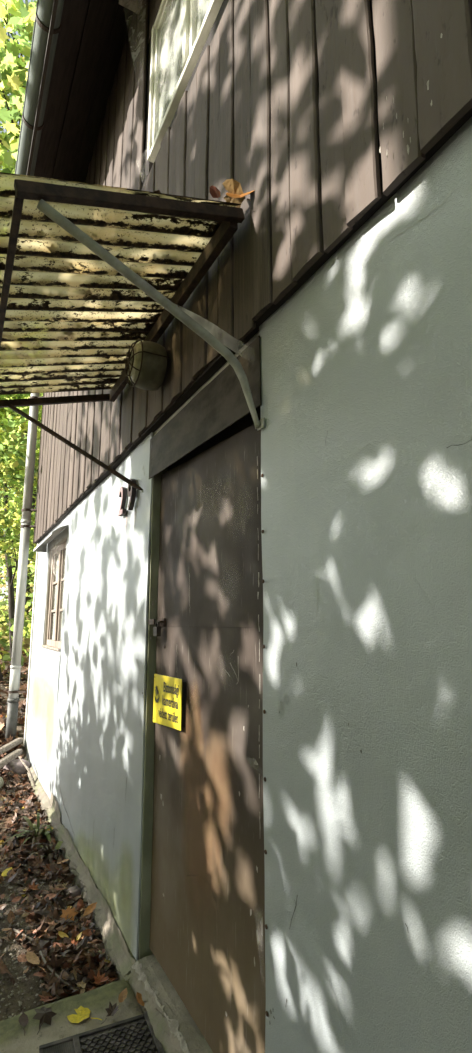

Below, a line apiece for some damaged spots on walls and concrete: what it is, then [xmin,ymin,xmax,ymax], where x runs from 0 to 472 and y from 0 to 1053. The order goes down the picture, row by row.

flaking render [50,792,190,1053]